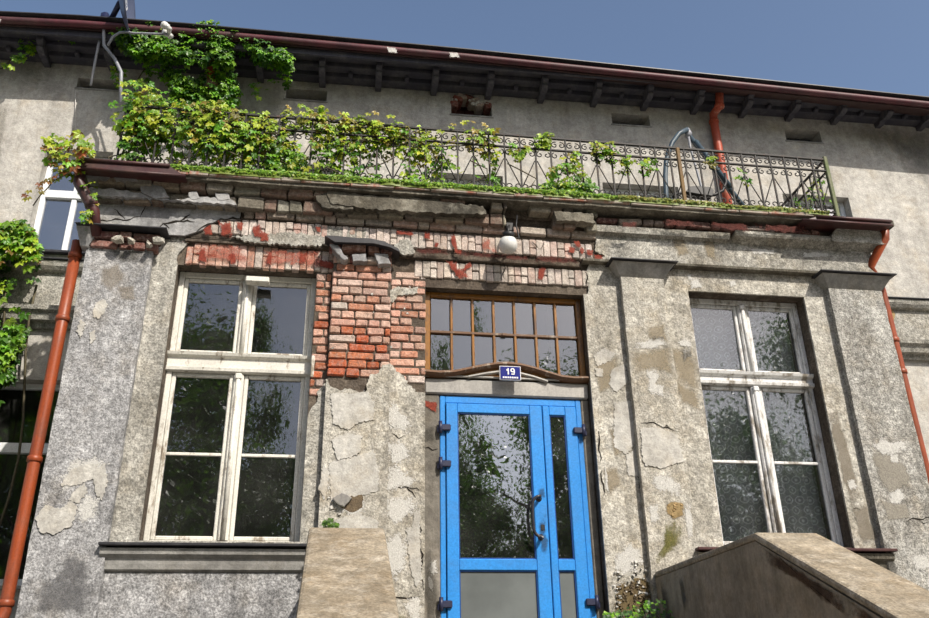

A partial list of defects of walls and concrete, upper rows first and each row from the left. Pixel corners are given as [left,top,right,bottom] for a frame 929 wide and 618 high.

spalling [450,93,492,116]
crack [87,206,242,232]
spalling [185,211,603,396]
peeling [35,456,109,535]
peeling [318,391,438,618]
peeling [593,348,693,539]
peeling [872,438,910,520]
peeling [611,542,650,616]